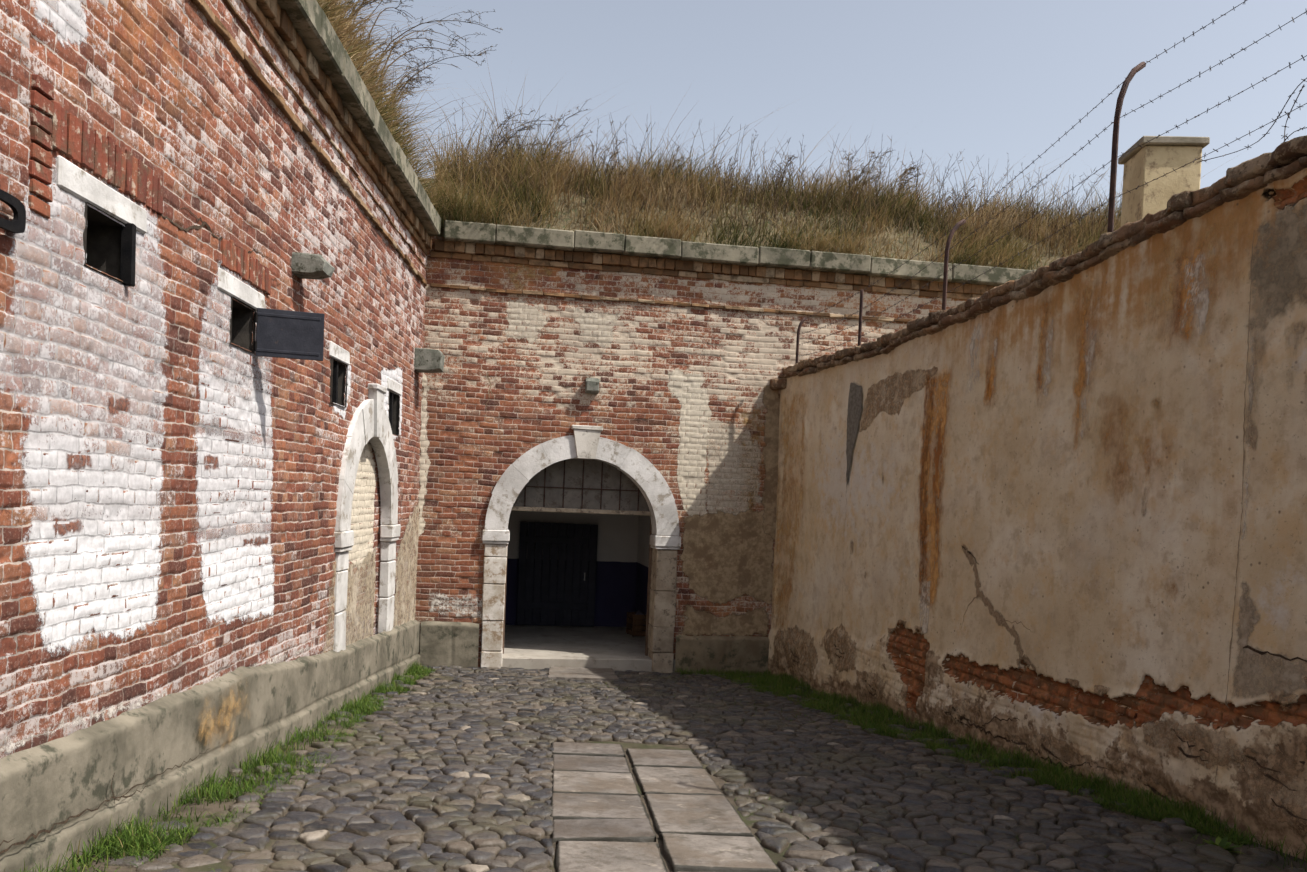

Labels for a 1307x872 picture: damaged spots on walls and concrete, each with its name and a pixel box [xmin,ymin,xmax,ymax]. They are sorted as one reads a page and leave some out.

spalling [1273,176,1307,210]
corrosion [919,373,950,633]
crack [961,545,1036,671]
spalling [774,620,930,713]
spalling [942,654,1307,769]
peeling [1005,731,1212,816]